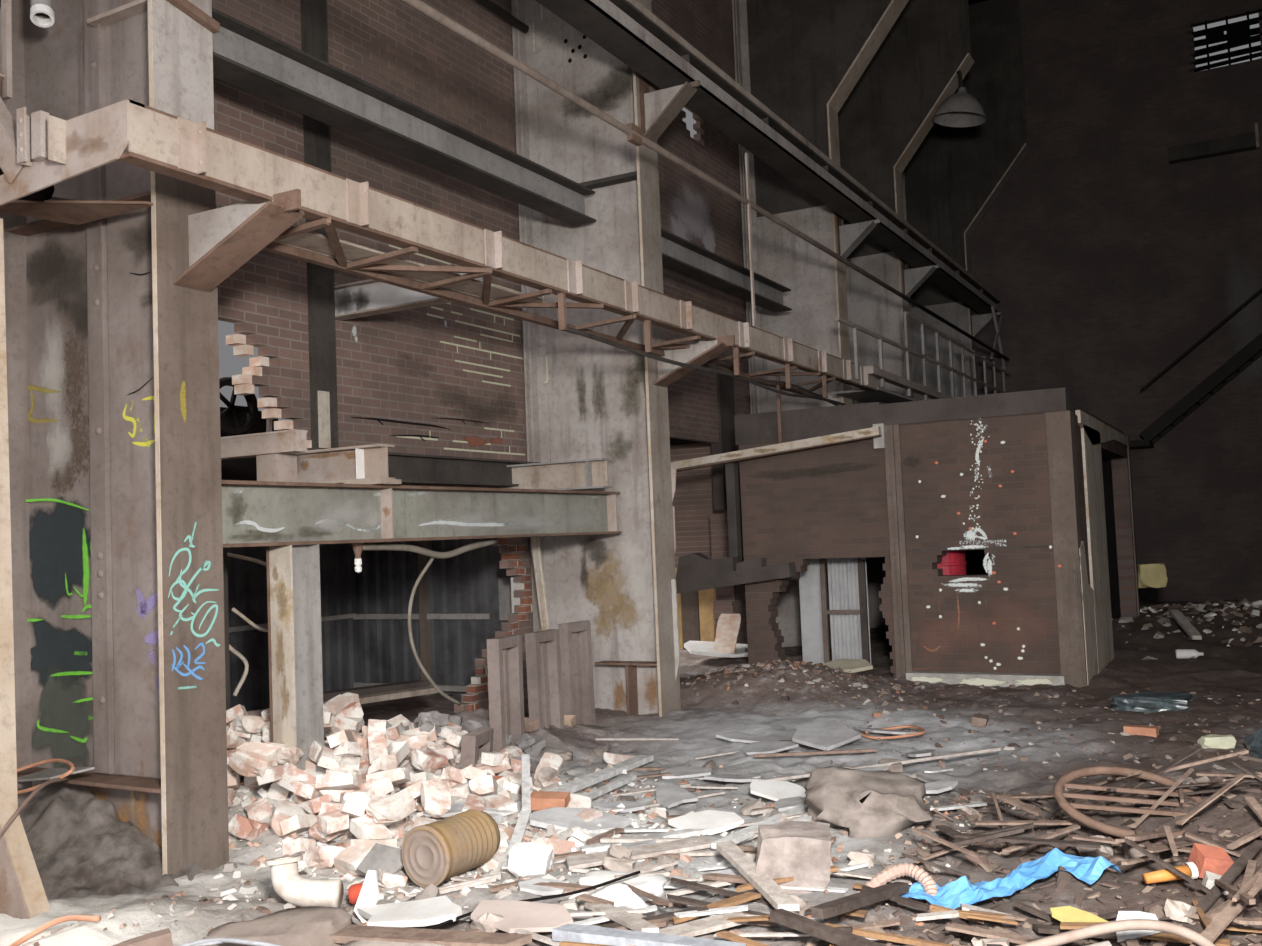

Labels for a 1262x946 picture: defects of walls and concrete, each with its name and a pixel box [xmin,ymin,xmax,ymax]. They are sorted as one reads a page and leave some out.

crack [351,417,489,442]
leakage [581,539,605,586]